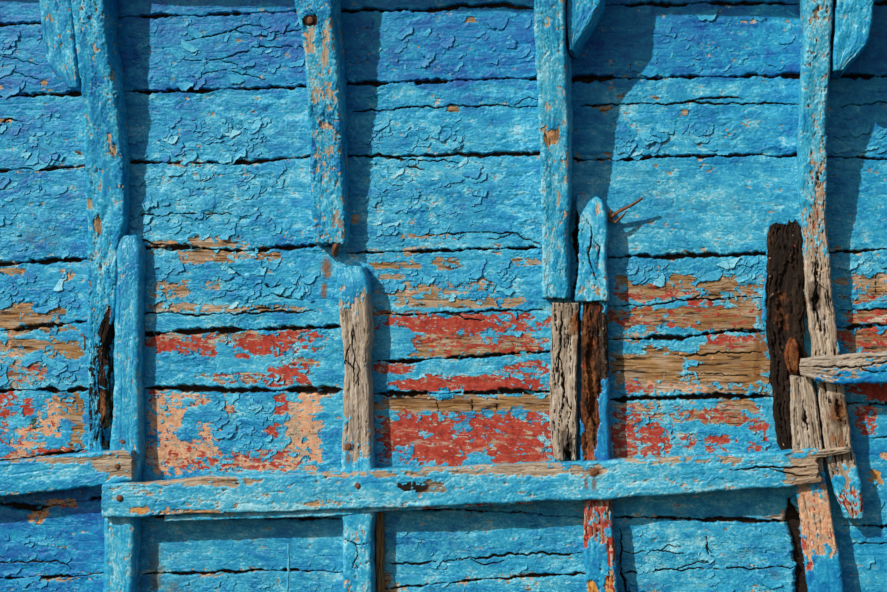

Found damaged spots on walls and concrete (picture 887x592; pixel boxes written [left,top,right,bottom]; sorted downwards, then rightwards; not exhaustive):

crack [187,24,301,79]
peeling [0,111,64,171]
peeling [86,198,102,236]
peeling [0,224,108,461]
peeling [368,257,559,466]
peeling [607,256,772,459]
peeling [144,328,326,476]
peeling [844,383,887,436]
peeling [863,469,885,487]
crack [389,552,580,565]
peeling [586,536,619,592]
crack [619,531,799,592]